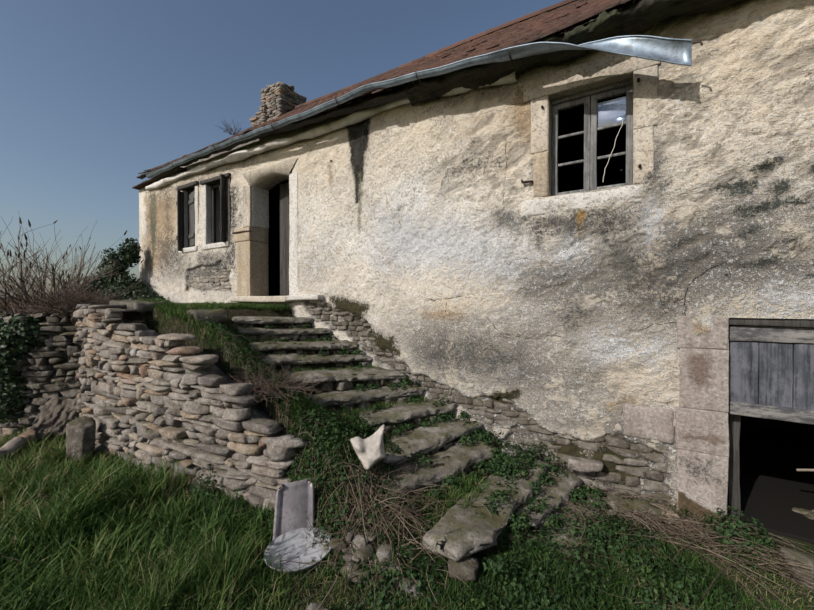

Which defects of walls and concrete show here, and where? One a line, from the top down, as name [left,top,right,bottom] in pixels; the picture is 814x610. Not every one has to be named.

water stain [346,118,371,225]
spalling [185,257,231,295]
water stain [370,148,747,318]
crack [634,264,756,332]
spalling [300,301,676,504]